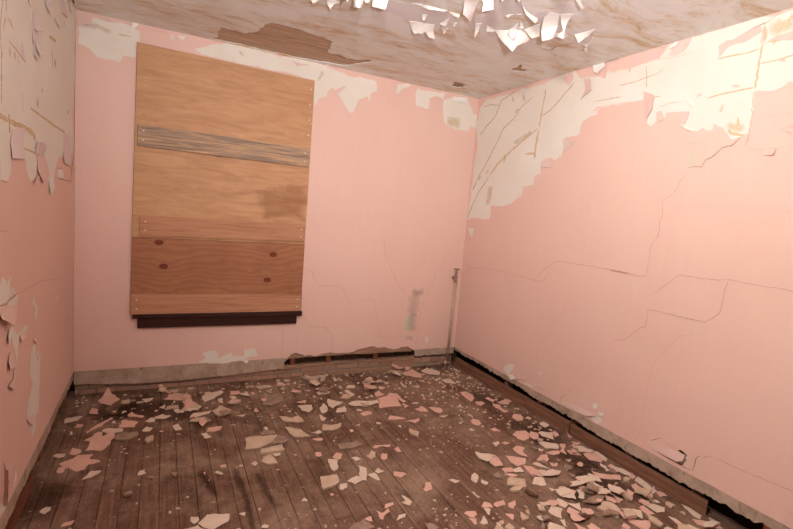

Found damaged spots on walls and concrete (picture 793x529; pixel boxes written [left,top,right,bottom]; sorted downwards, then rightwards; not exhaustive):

peeling [0,0,186,194]
peeling [193,43,377,113]
peeling [311,0,595,52]
peeling [415,10,793,237]
crack [462,113,785,282]
peeling [0,277,41,437]
peeling [199,348,258,364]
crack [616,275,793,341]